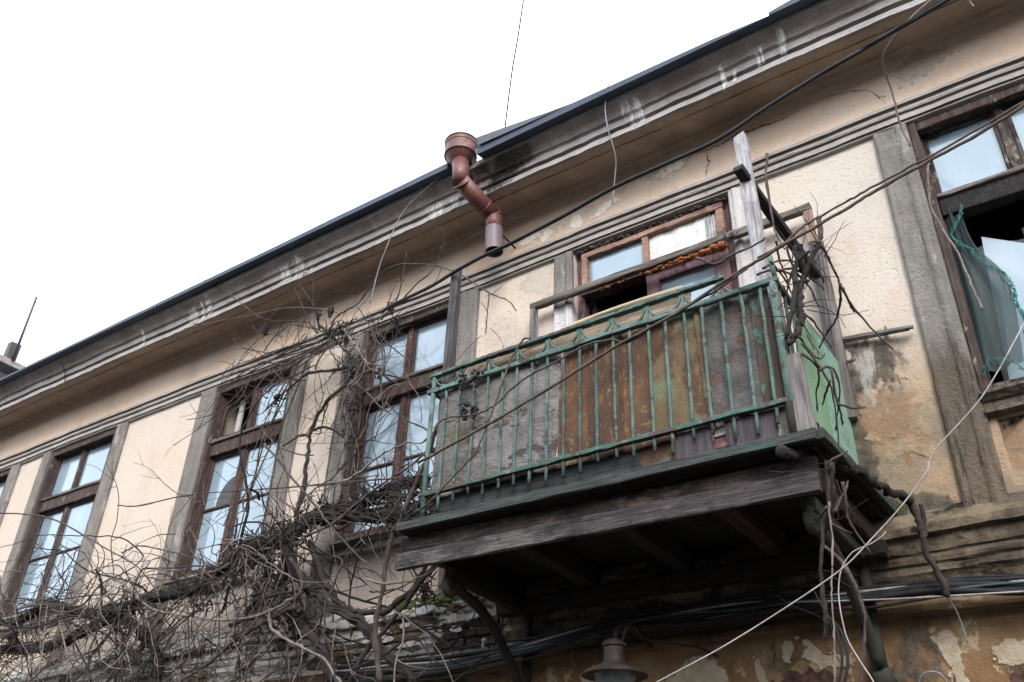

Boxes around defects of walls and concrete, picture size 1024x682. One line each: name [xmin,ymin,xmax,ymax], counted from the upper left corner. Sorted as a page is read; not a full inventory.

damp [849,326,901,483]
damp [888,491,954,517]
peeling [753,635,856,682]
peeling [927,626,970,682]
peeling [991,637,1024,682]